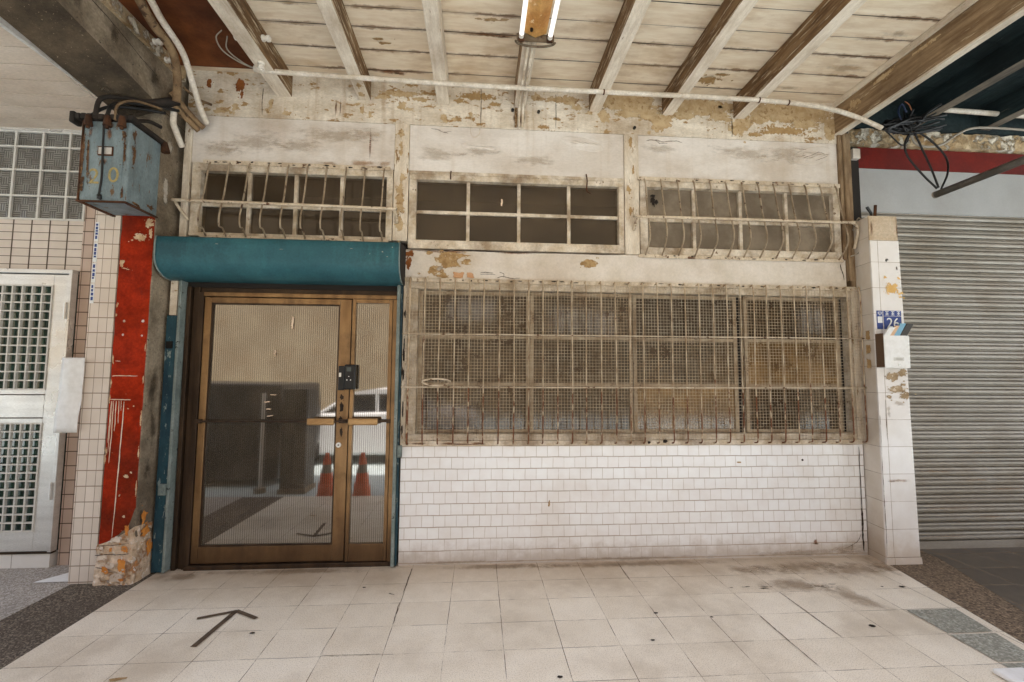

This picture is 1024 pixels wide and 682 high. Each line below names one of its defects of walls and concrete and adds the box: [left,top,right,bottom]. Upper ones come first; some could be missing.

peeling [204,78,248,117]
peeling [352,83,507,123]
peeling [529,92,835,143]
flaking render [848,128,1024,155]
flaking render [580,257,599,268]
peeling [884,369,917,403]
flaking render [92,511,153,586]